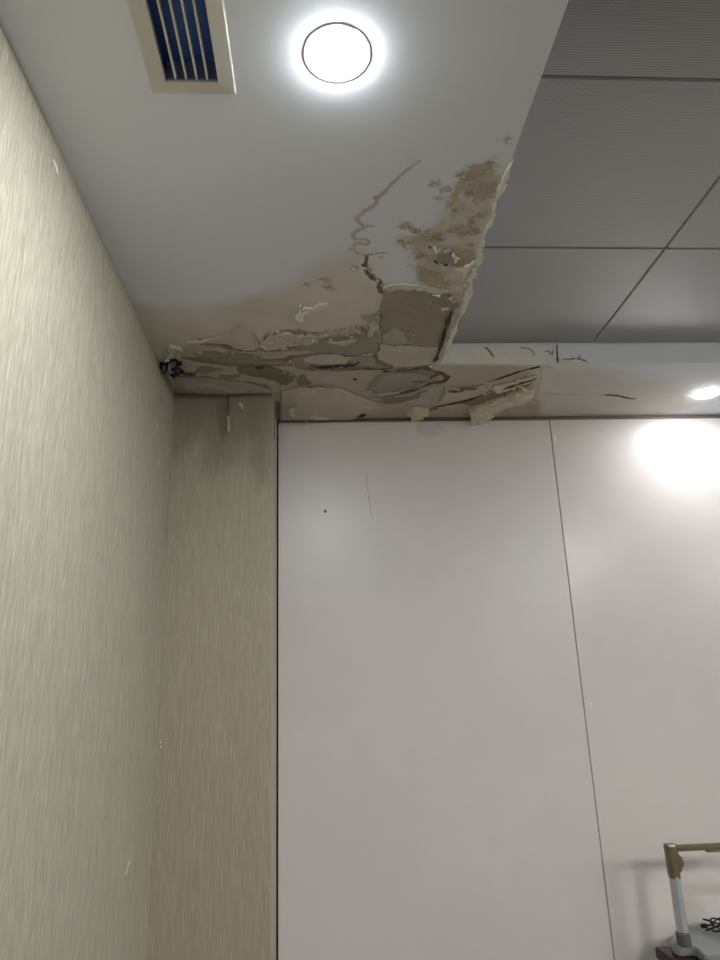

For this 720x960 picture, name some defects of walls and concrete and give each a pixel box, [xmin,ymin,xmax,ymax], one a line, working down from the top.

flaking render [168,159,589,426]
damp [123,144,720,421]